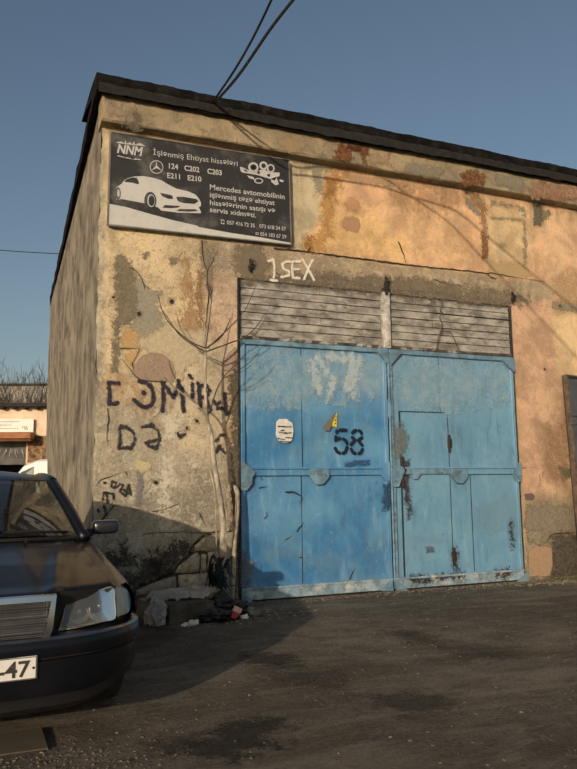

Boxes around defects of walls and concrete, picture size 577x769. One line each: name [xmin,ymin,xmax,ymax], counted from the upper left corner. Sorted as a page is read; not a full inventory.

corrosion [304,140,370,254]
flaking render [404,162,444,179]
corrosion [459,168,489,259]
flaking render [465,195,528,268]
flaking render [495,173,577,202]
flaking render [109,254,209,377]
corrosion [381,420,414,522]
water stain [104,534,196,599]